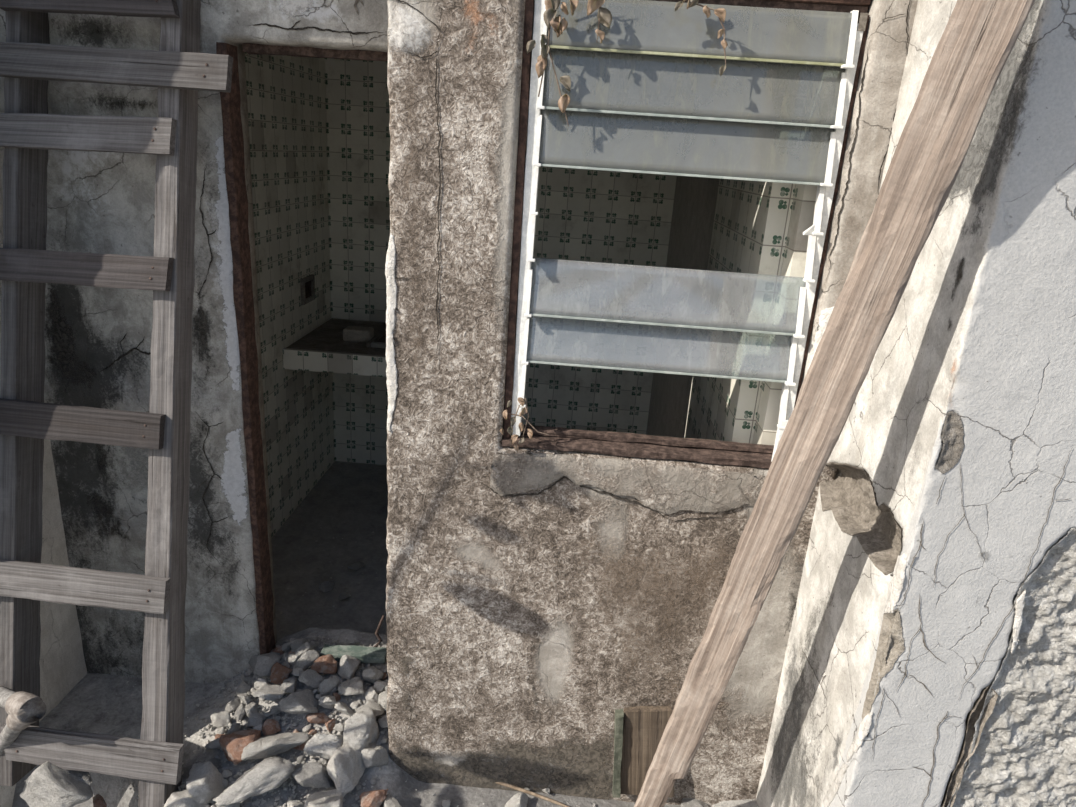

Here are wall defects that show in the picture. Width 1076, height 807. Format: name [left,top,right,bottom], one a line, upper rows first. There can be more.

crack [248,0,383,35]
water stain [948,0,1040,216]
crack [398,0,444,366]
water stain [44,288,96,392]
spalling [935,411,964,474]
water stain [86,492,129,541]
crack [485,476,718,522]
spalling [819,462,909,763]
crack [872,447,1073,807]